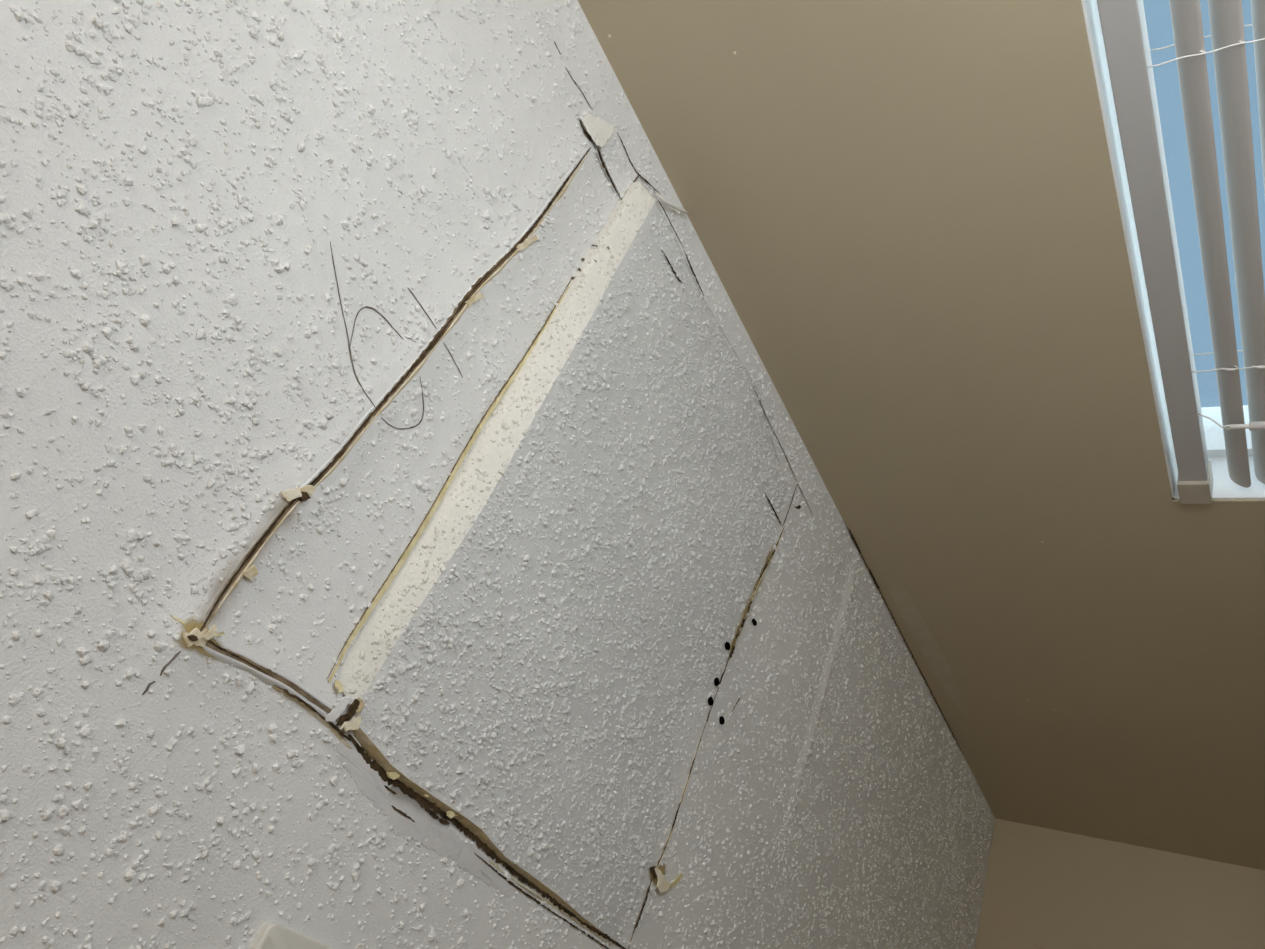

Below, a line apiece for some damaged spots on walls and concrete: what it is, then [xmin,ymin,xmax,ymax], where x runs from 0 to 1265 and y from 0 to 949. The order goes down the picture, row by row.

crack [142,132,814,949]
crack [844,522,963,754]